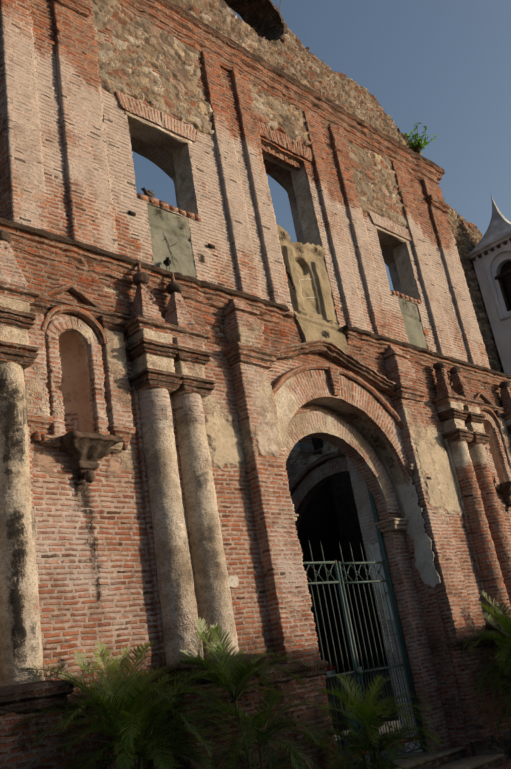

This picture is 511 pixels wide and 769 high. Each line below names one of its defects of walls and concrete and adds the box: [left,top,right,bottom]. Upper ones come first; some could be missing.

crack [284,261,340,333]
leakage [0,369,28,489]
peeling [203,395,245,472]
peeling [255,423,280,456]
leakage [6,508,39,670]
leakage [75,473,101,601]
peeling [396,427,463,587]